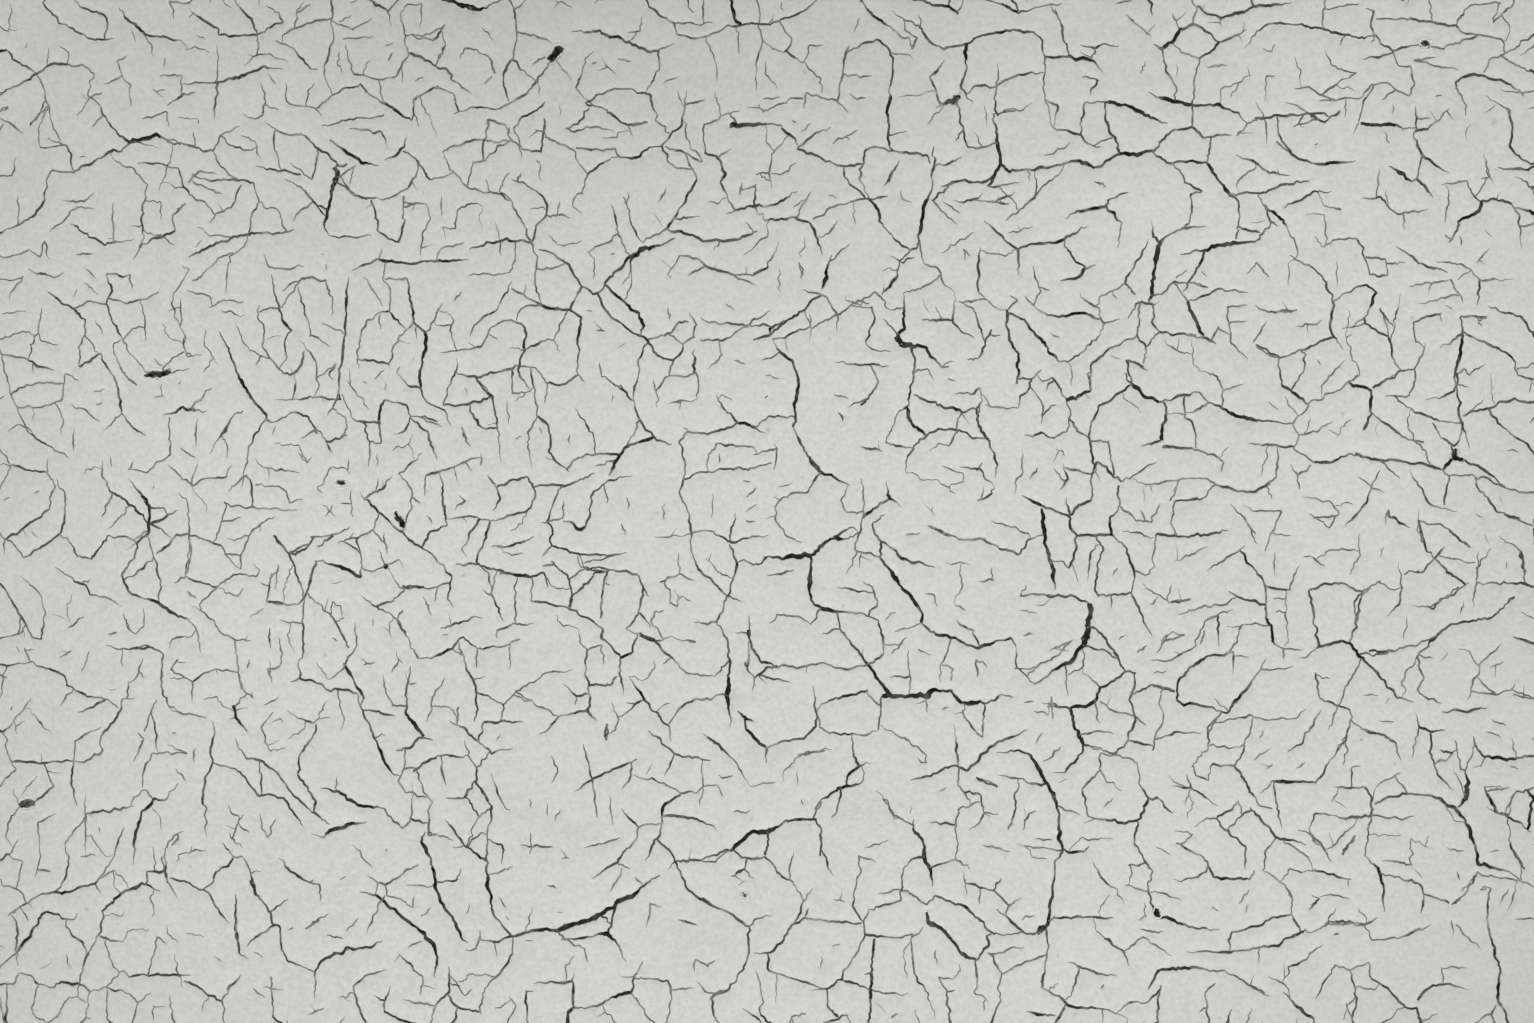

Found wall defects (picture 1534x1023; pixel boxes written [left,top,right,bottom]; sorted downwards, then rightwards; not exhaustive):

crack [663,241,781,292]
crack [1066,192,1128,248]
crack [1365,170,1428,229]
crack [1284,190,1511,309]
crack [47,265,215,436]
crack [834,361,888,421]
crack [128,388,231,510]
crack [1231,505,1290,573]
crack [0,576,83,640]
crack [55,567,145,634]
crack [278,858,321,900]
crack [339,969,386,1023]